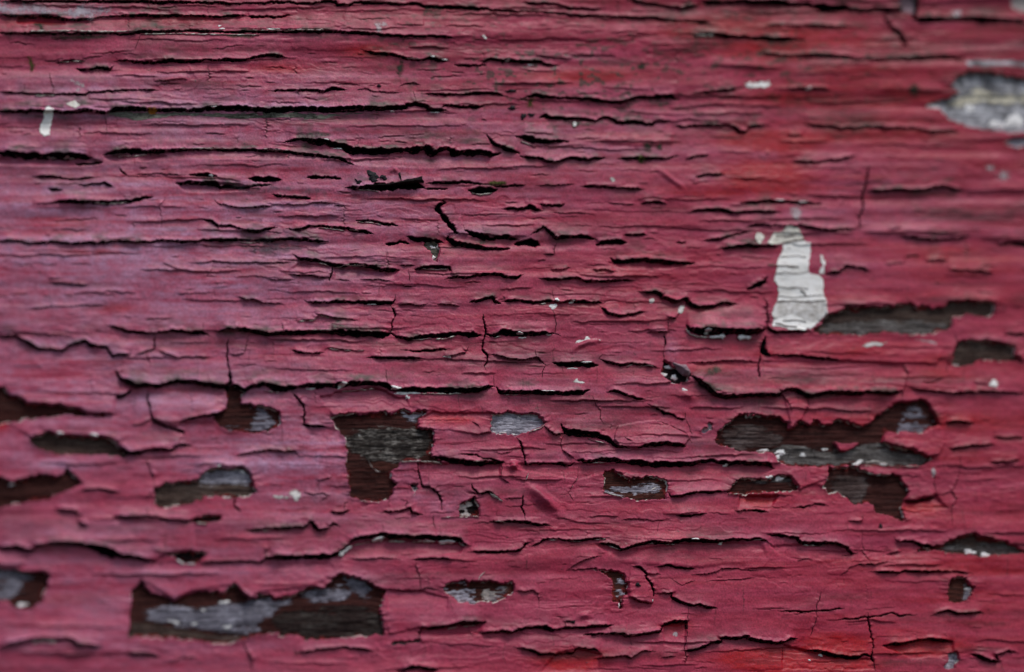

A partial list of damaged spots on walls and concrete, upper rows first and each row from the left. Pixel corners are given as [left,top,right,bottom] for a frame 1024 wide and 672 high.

crack [0,0,1024,136]
peeling [926,73,1024,149]
peeling [813,300,994,336]
peeling [0,469,82,508]
peeling [29,431,141,458]
peeling [154,465,257,508]
peeling [213,383,281,434]
peeling [330,409,442,503]
crack [0,135,1024,670]
peeling [701,399,938,522]
peeling [128,573,420,645]
crack [397,662,437,672]